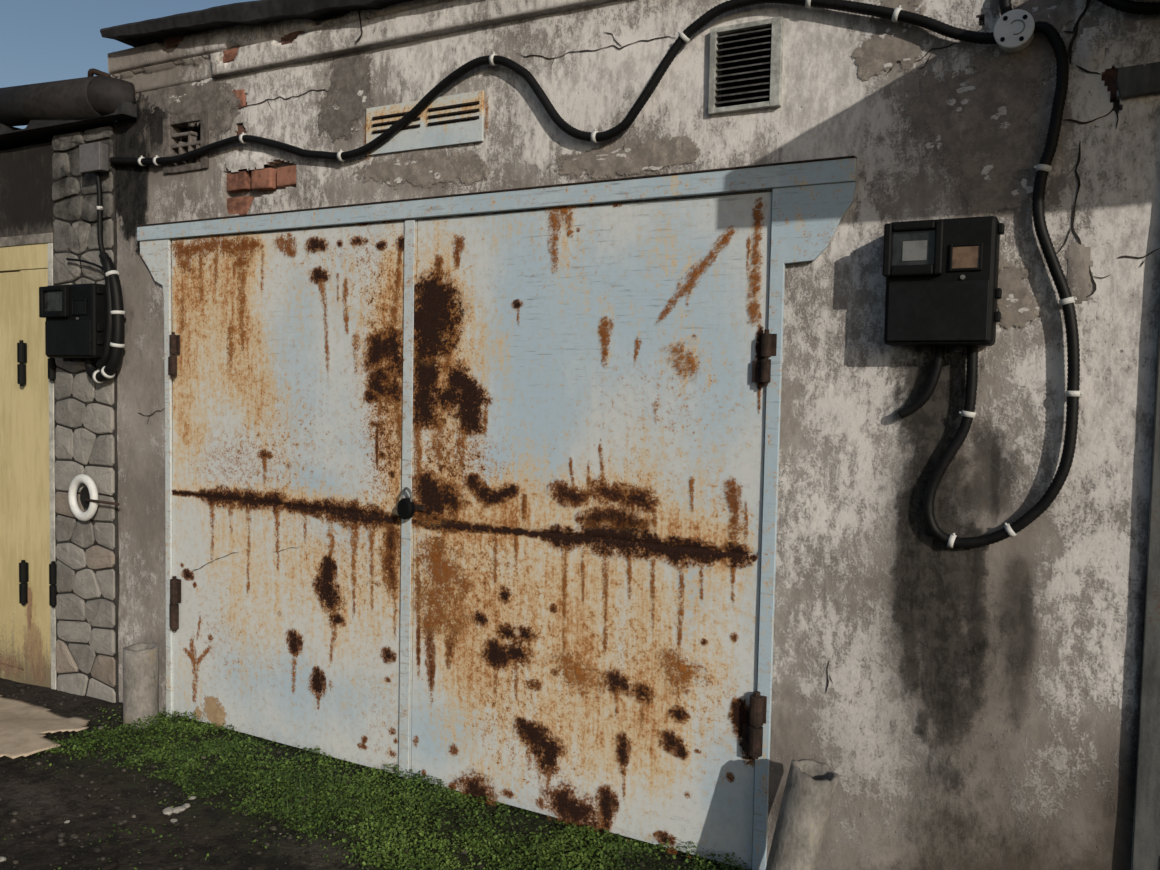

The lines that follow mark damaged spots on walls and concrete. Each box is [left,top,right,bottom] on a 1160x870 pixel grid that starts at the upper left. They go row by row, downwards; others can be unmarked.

crack [518,32,674,66]
crack [1063,0,1101,75]
peeling [852,0,1075,217]
spalling [227,162,296,215]
rust [548,204,594,268]
rust [656,197,765,361]
crack [1057,104,1160,299]
rust [171,220,758,767]
damp [887,350,989,744]
rust [448,771,514,806]
rust [514,717,632,834]
rust [653,830,691,858]